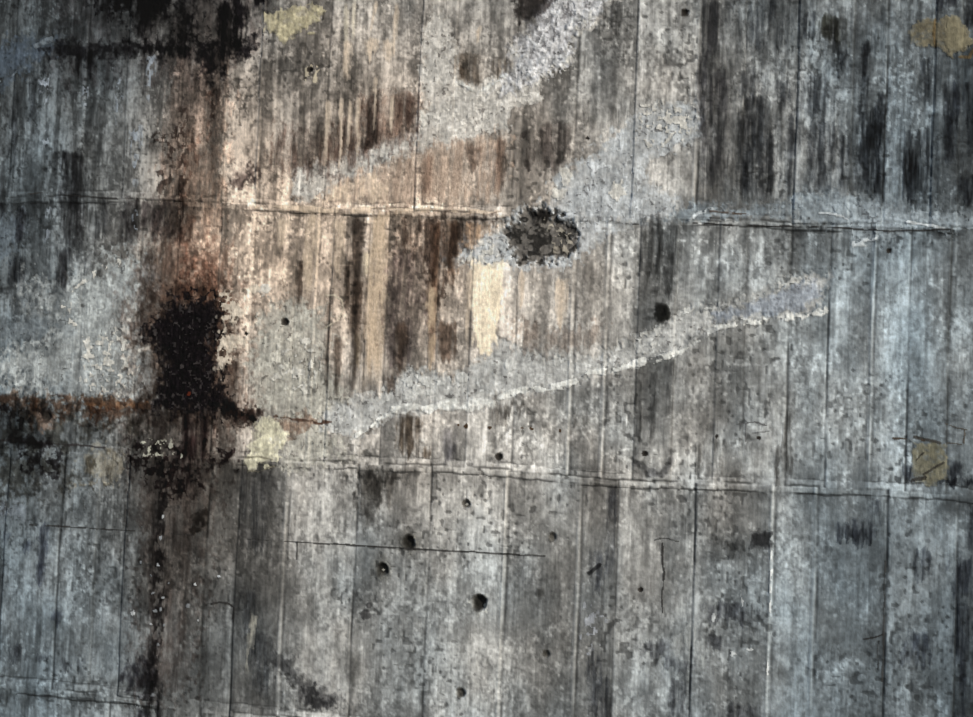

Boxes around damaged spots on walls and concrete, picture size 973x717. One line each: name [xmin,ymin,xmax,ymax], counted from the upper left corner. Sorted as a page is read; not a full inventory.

damp [341,0,400,82]
damp [578,0,622,56]
damp [273,76,613,398]
damp [580,96,631,131]
spalling [459,93,973,278]
damp [639,0,973,325]
rust [1,385,153,428]
damp [0,0,292,717]
rust [208,393,332,442]
damp [630,358,679,479]
damp [238,587,349,716]